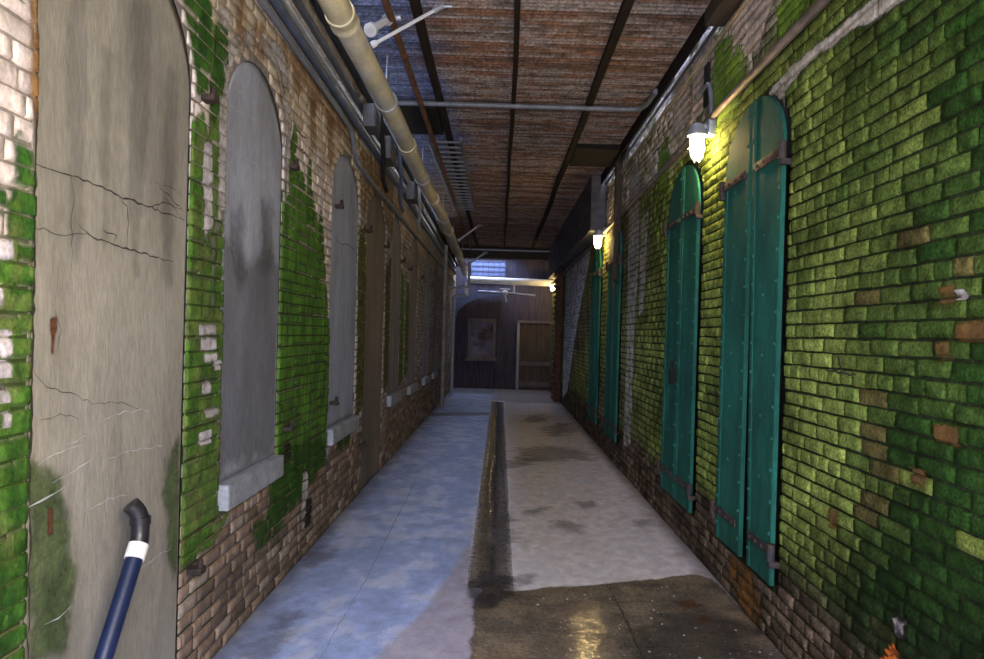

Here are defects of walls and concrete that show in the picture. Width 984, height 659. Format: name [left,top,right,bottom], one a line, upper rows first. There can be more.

peeling [0,240,14,259]
spalling [938,285,967,305]
peeling [0,330,13,379]
crack [20,0,184,659]
spalling [935,320,984,362]
peeling [0,391,12,429]
spalling [934,424,959,446]
leakage [7,391,77,659]
leakage [162,441,180,572]
spalling [893,616,906,640]